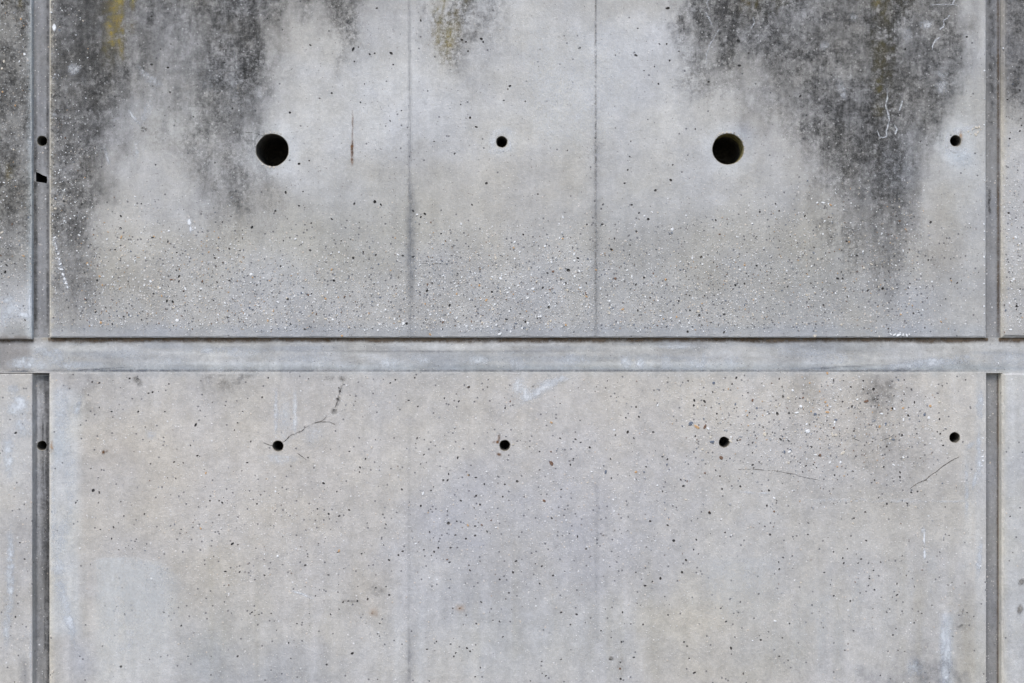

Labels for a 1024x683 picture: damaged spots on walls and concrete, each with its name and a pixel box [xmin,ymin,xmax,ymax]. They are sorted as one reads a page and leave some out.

water stain [0,0,132,283]
water stain [214,0,259,88]
water stain [679,0,958,210]